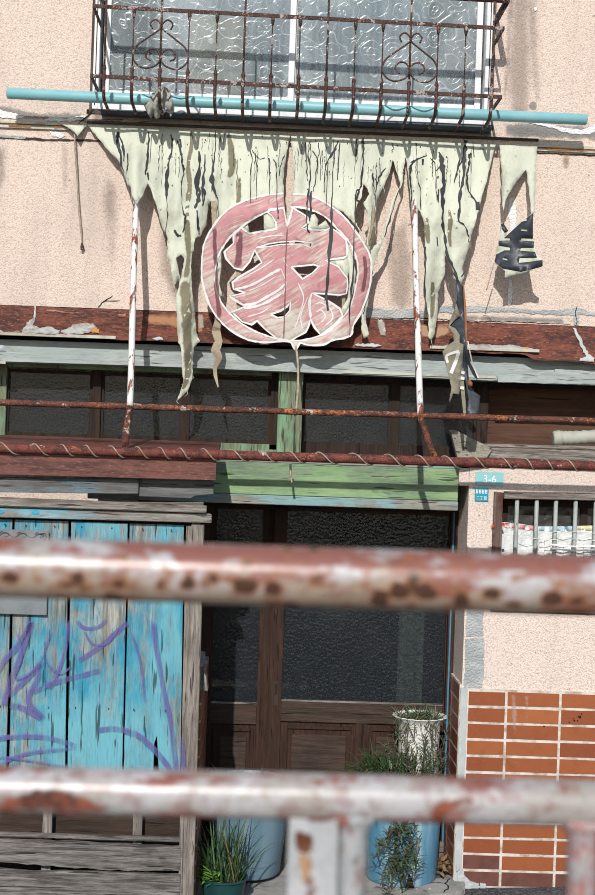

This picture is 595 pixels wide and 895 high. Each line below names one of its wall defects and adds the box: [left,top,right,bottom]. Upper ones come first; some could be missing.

rust [146,315,177,327]
rust [195,315,204,332]
rust [421,325,449,338]
peeling [573,328,595,362]
rust [4,789,108,812]
rust [431,798,473,822]
rust [295,831,313,883]